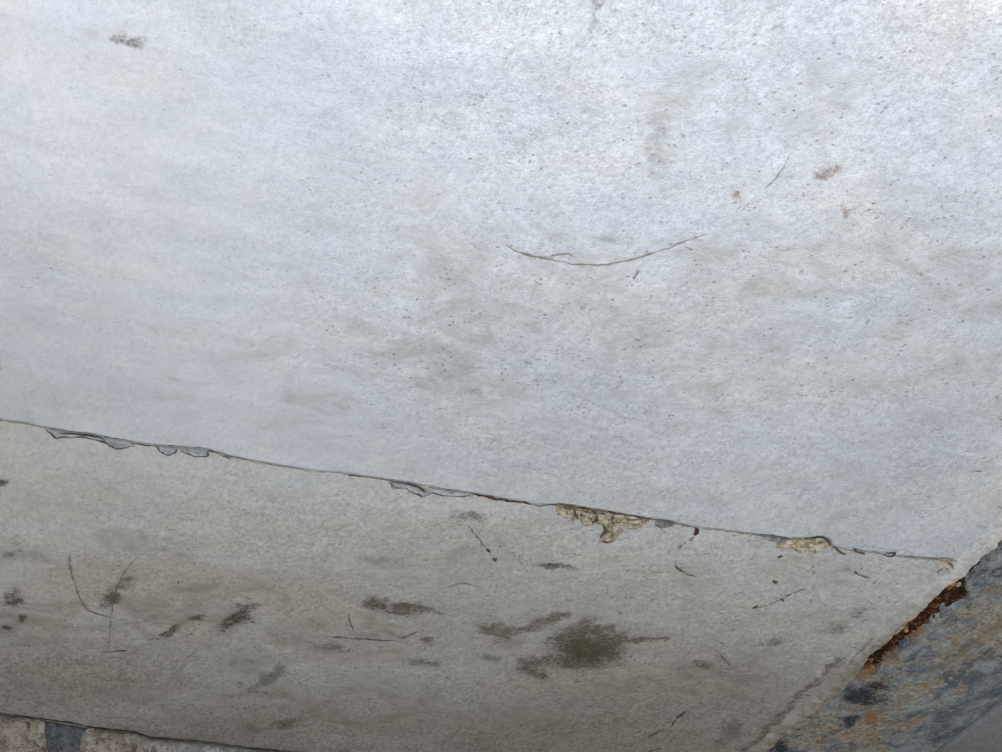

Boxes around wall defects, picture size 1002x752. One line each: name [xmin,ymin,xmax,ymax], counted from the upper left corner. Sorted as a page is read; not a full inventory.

crack [509,234,706,280]
crack [0,420,957,579]
spalling [555,503,676,544]
leakage [481,613,659,679]
corrosion [855,558,981,680]